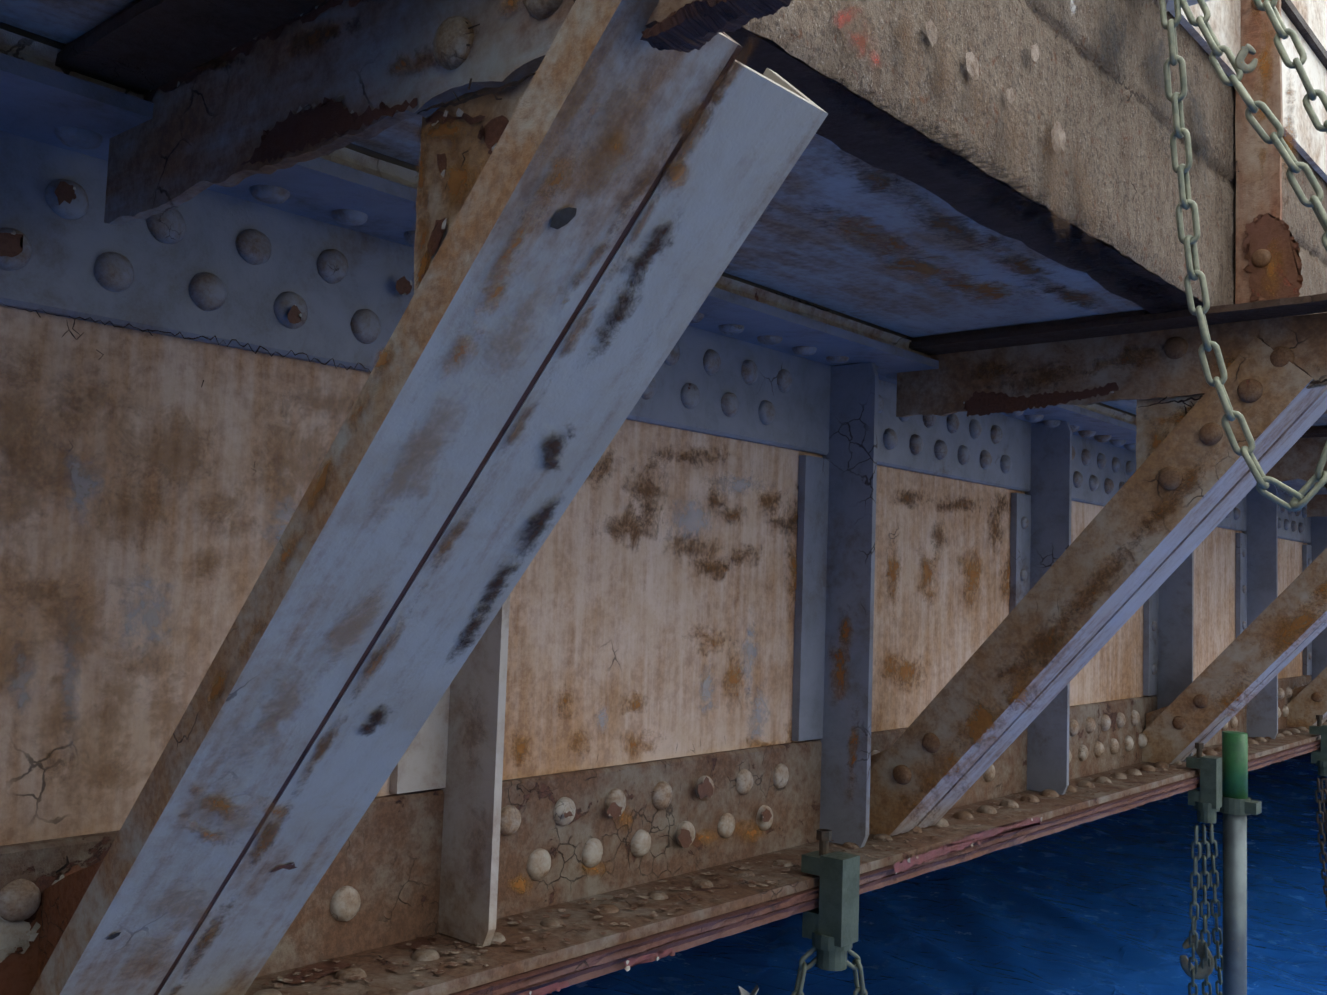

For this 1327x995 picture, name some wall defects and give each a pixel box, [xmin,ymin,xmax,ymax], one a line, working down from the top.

peeling [241,94,509,165]
rust [561,0,793,355]
rust [1282,90,1297,180]
peeling [395,218,447,296]
rust [815,159,1099,309]
rust [1242,213,1303,302]
rust [543,429,572,469]
rust [608,449,721,549]
rust [456,501,559,650]
rust [918,496,1008,606]
rust [1001,465,1201,710]
rust [959,701,1001,747]